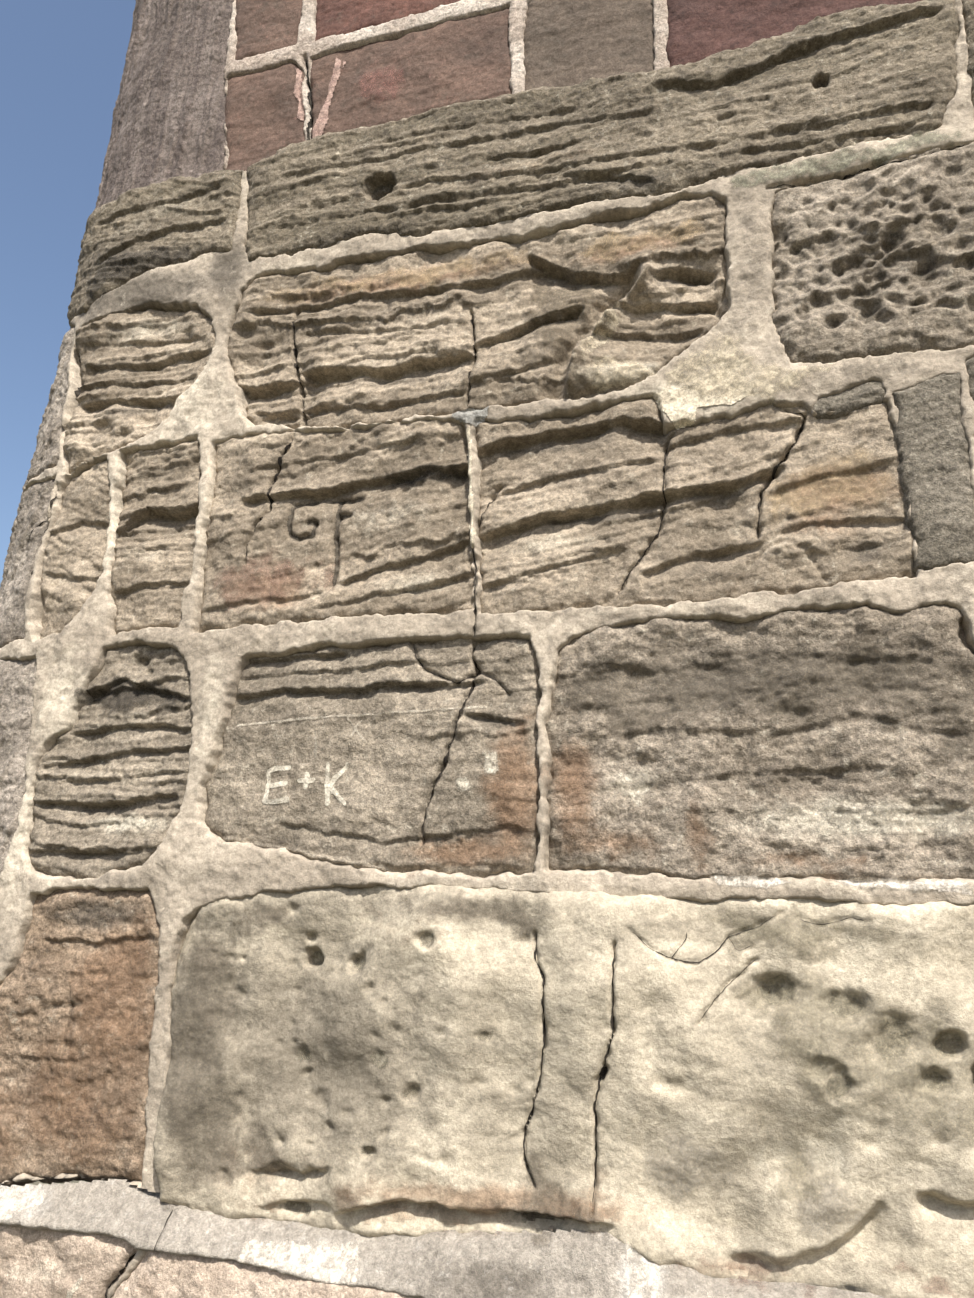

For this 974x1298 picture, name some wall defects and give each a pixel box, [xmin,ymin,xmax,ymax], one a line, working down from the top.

crack [305,60,313,140]
crack [246,321,308,556]
crack [621,437,673,589]
crack [757,412,805,537]
crack [414,489,509,842]
crack [523,936,546,1185]
crack [592,916,870,1211]